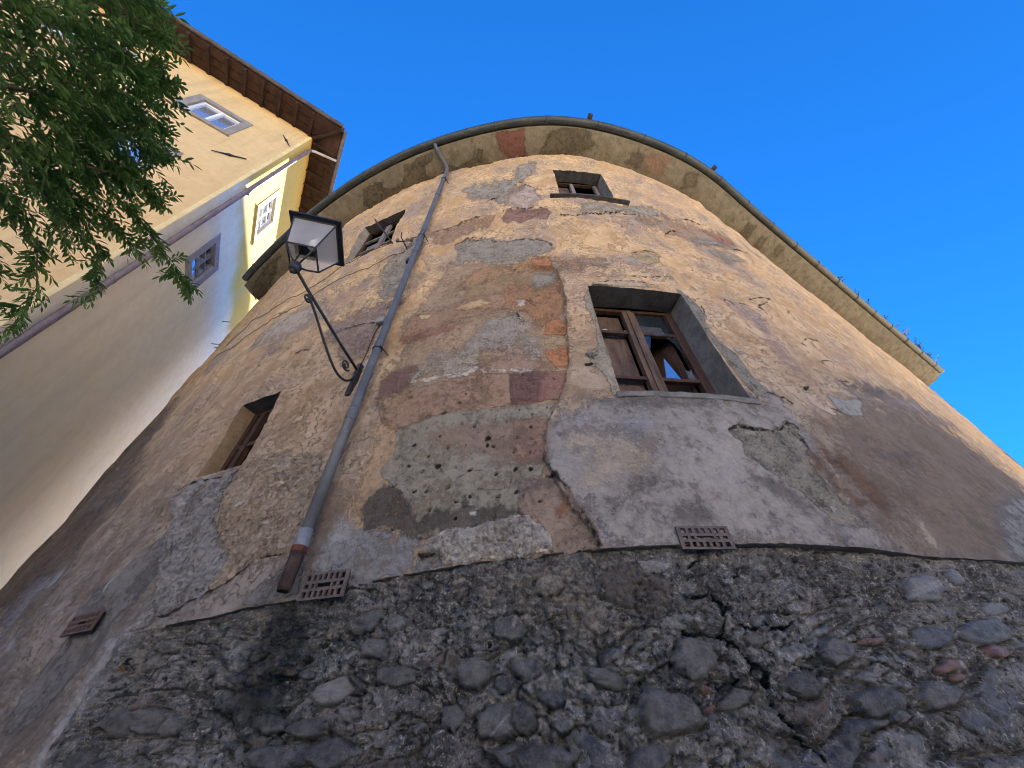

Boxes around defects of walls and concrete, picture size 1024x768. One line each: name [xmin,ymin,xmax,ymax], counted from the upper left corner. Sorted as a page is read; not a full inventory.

flaking render [251,128,654,573]
peeling [122,451,326,633]
crack [545,441,603,548]
flaking render [728,420,869,529]